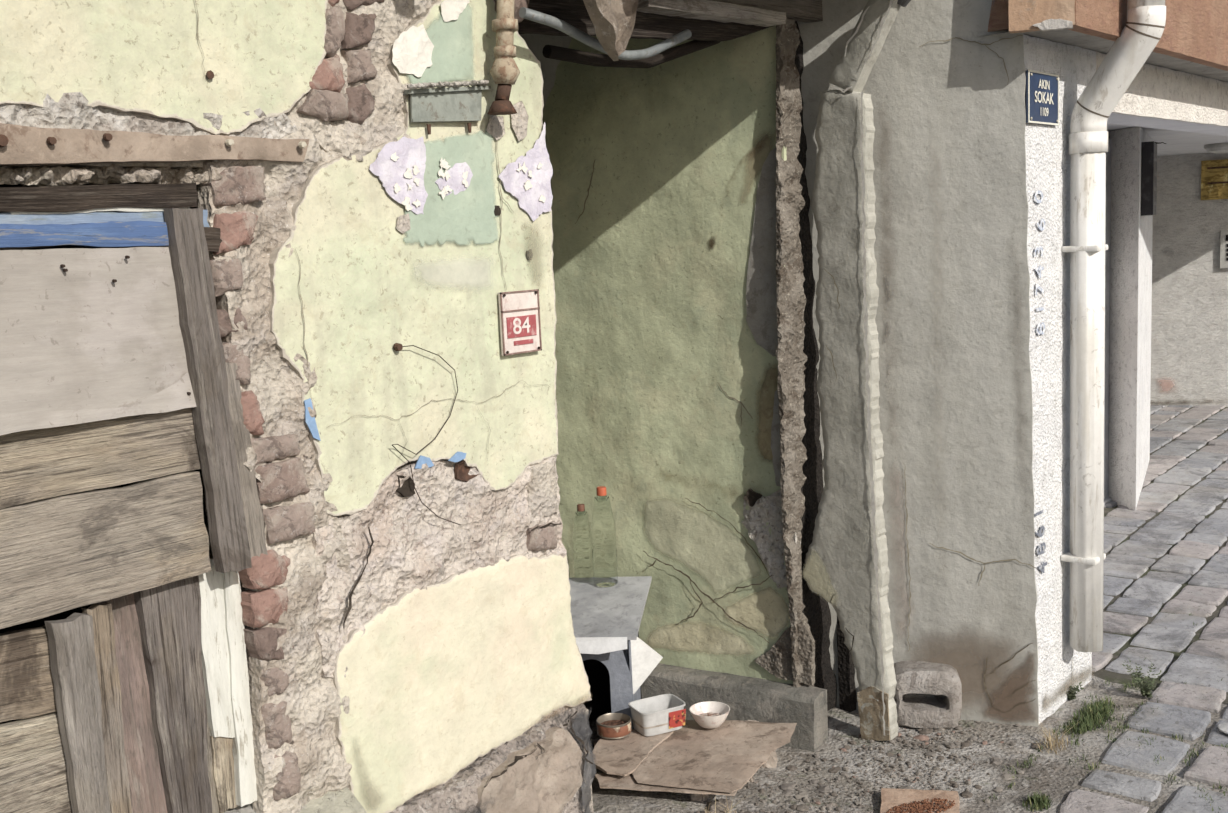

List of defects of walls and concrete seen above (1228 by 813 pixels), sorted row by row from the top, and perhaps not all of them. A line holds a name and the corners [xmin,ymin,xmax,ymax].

spalling [0,0,583,813]
spalling [742,19,837,712]
crack [343,527,374,629]
crack [903,462,1037,651]
crack [984,643,1035,713]